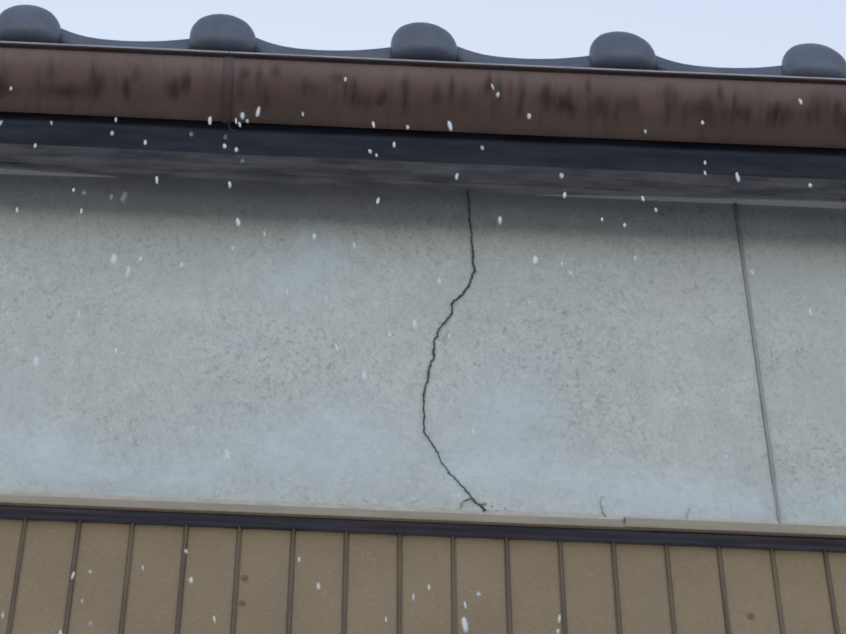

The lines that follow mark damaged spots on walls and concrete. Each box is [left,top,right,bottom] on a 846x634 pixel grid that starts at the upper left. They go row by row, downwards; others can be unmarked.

crack [422,190,486,512]